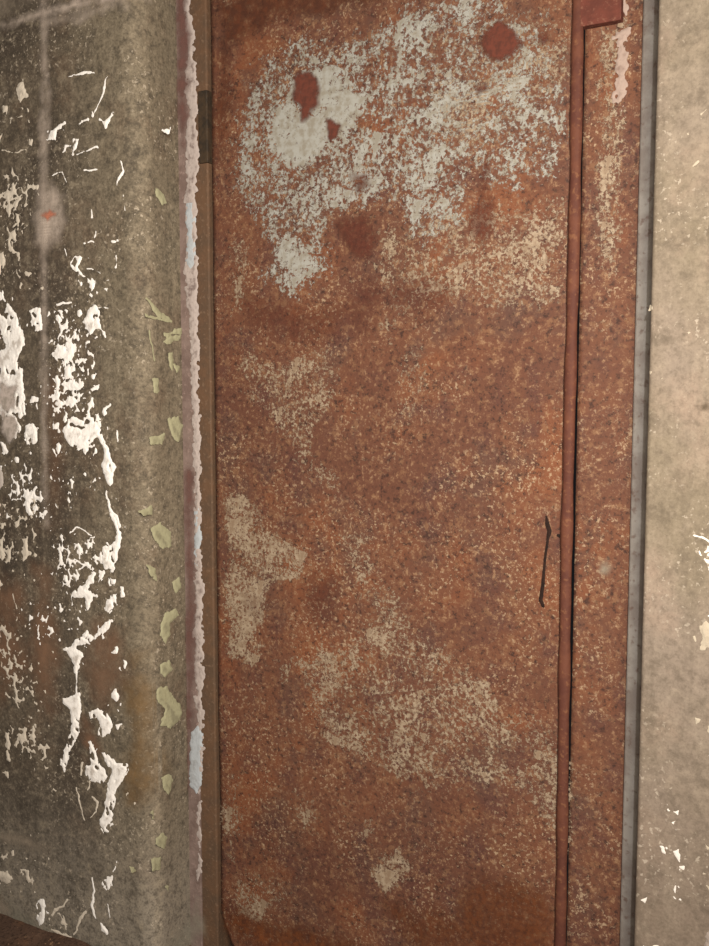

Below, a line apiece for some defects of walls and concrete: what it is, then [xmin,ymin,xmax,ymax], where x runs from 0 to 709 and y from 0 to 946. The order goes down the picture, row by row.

rust [482,21,521,60]
peeling [2,79,30,124]
peeling [46,121,98,156]
peeling [79,79,114,129]
rust [293,72,319,121]
rust [326,119,341,141]
peeling [226,0,570,345]
peeling [145,0,205,881]
peeling [233,336,340,492]
peeling [0,168,136,833]
peeling [221,493,307,668]
peeling [0,850,117,938]